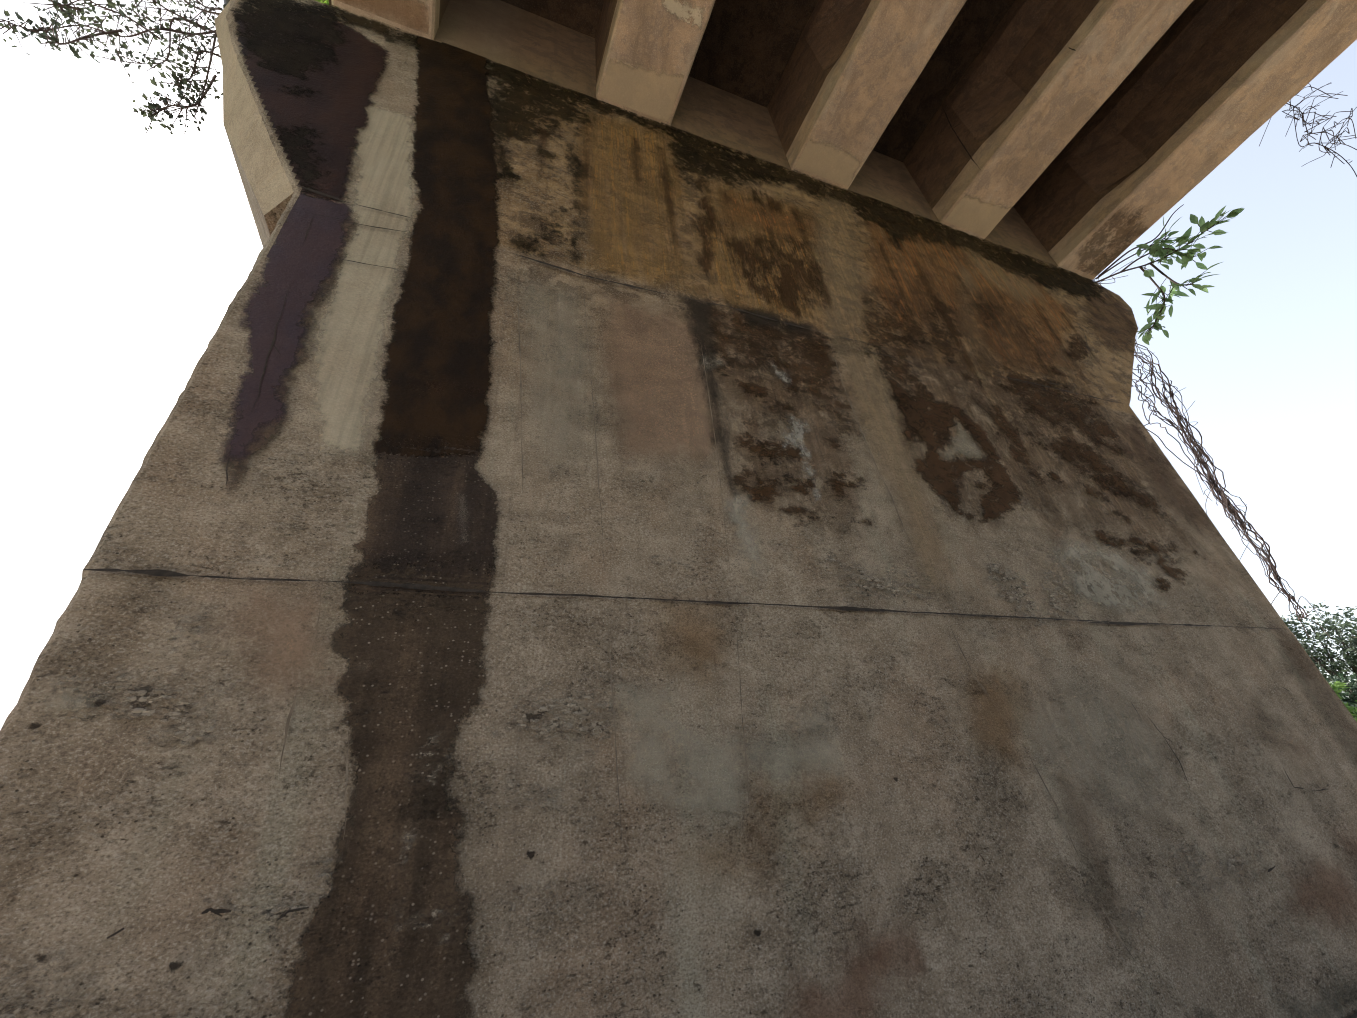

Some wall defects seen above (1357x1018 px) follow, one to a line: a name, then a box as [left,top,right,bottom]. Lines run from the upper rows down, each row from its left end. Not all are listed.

crack [296,185,417,245]
leakage [222,0,1134,1018]
leakage [1129,430,1207,524]
crack [84,251,1279,963]
leakage [1056,547,1156,608]